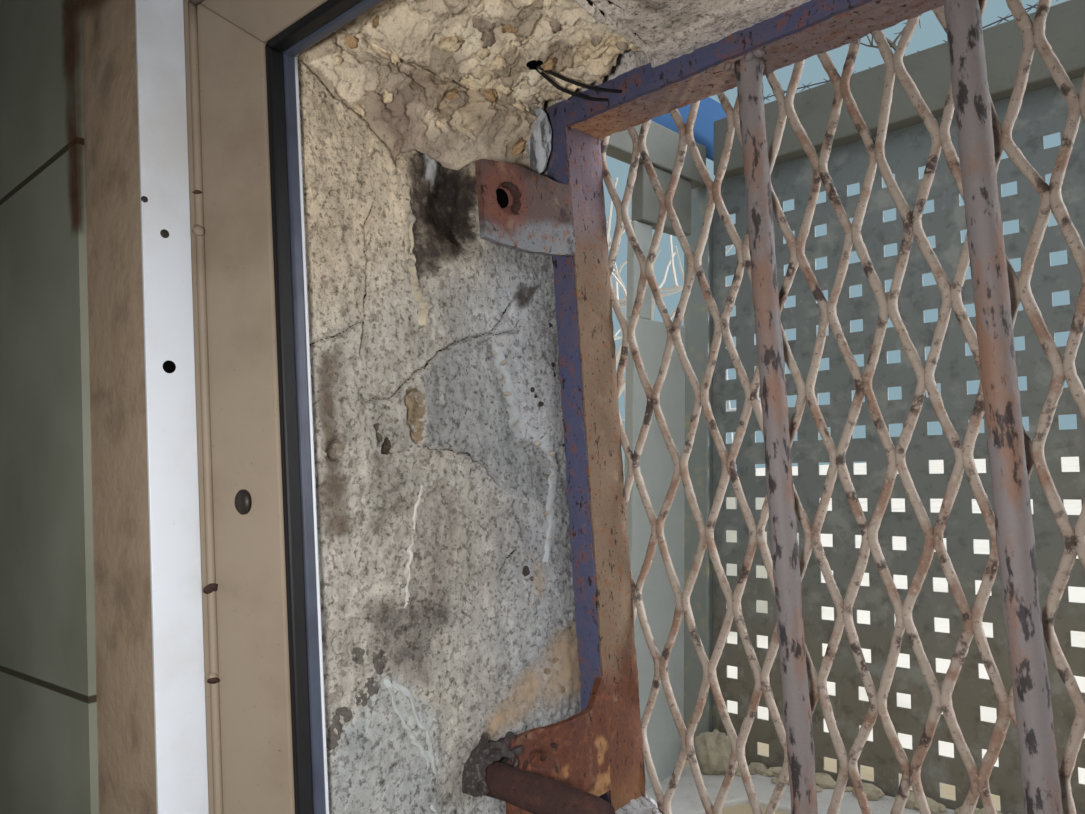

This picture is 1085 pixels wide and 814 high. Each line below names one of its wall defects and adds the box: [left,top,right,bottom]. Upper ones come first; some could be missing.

flaking render [296,0,642,174]
crack [362,302,512,404]
rust [553,629,581,692]